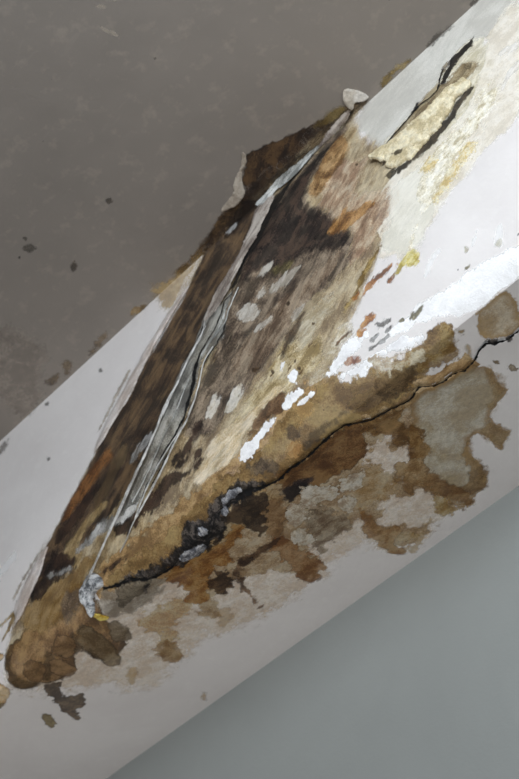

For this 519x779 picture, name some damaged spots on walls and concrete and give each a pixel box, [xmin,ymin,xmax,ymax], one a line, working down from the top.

peeling [13,547,71,628]
damp [0,99,519,720]
peeling [75,0,519,621]
crack [102,330,519,593]
damp [42,713,57,728]